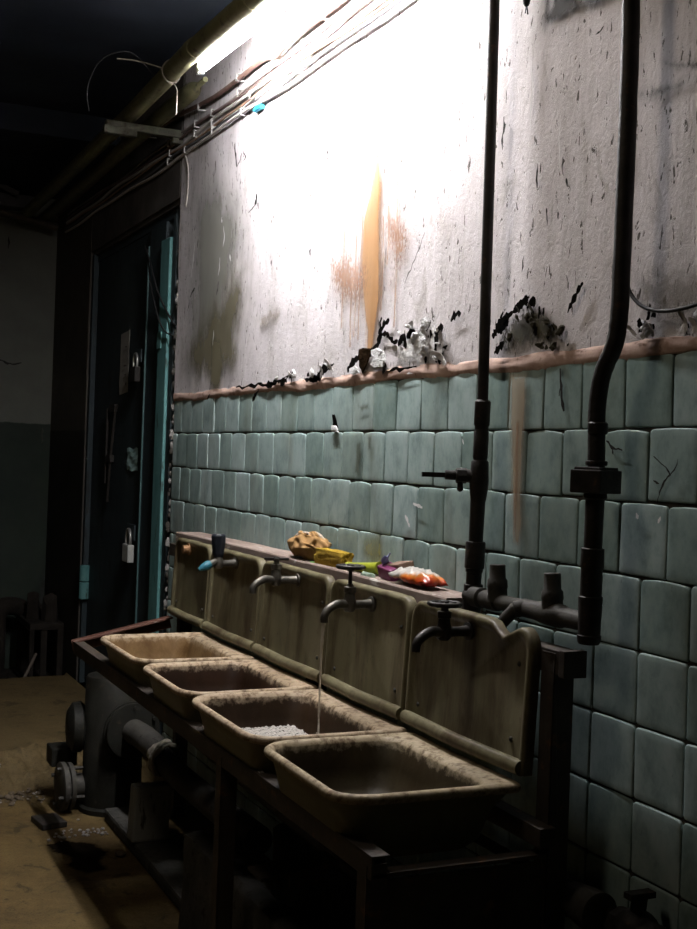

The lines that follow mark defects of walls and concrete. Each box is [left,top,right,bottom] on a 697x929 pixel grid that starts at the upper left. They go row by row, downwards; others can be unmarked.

rust [330,151,408,348]
peeling [236,358,334,390]
peeling [347,310,461,375]
peeling [627,304,656,340]
rust [511,377,525,543]